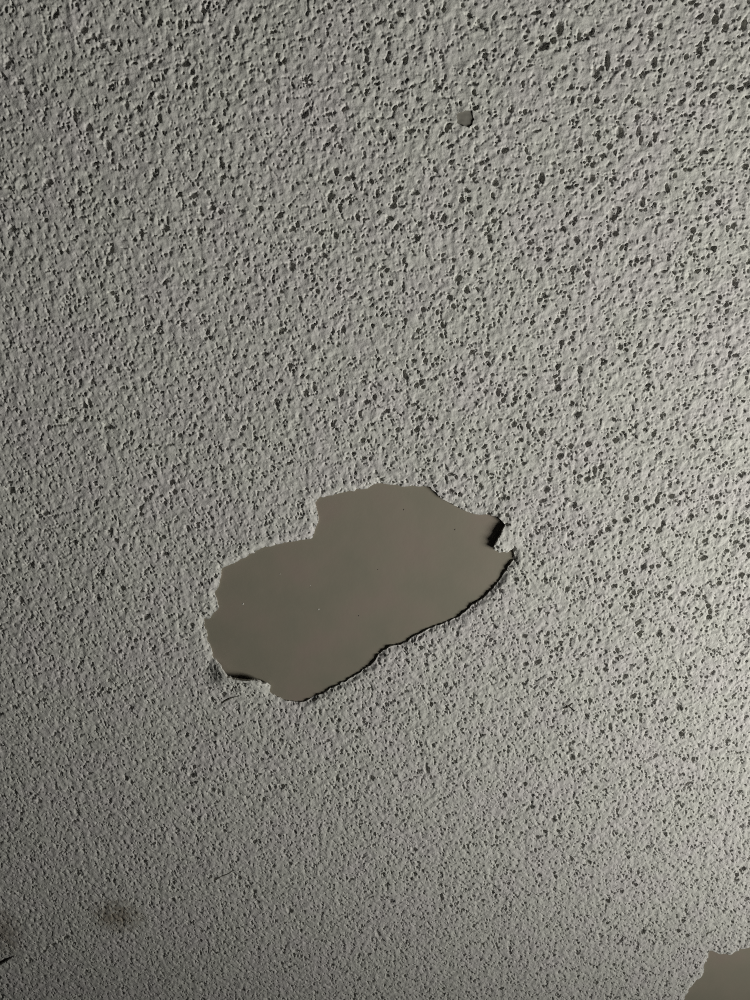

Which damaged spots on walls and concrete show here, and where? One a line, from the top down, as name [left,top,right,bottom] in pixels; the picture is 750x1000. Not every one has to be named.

spalling [457,110,474,127]
peeling [204,483,521,702]
peeling [684,947,750,1000]